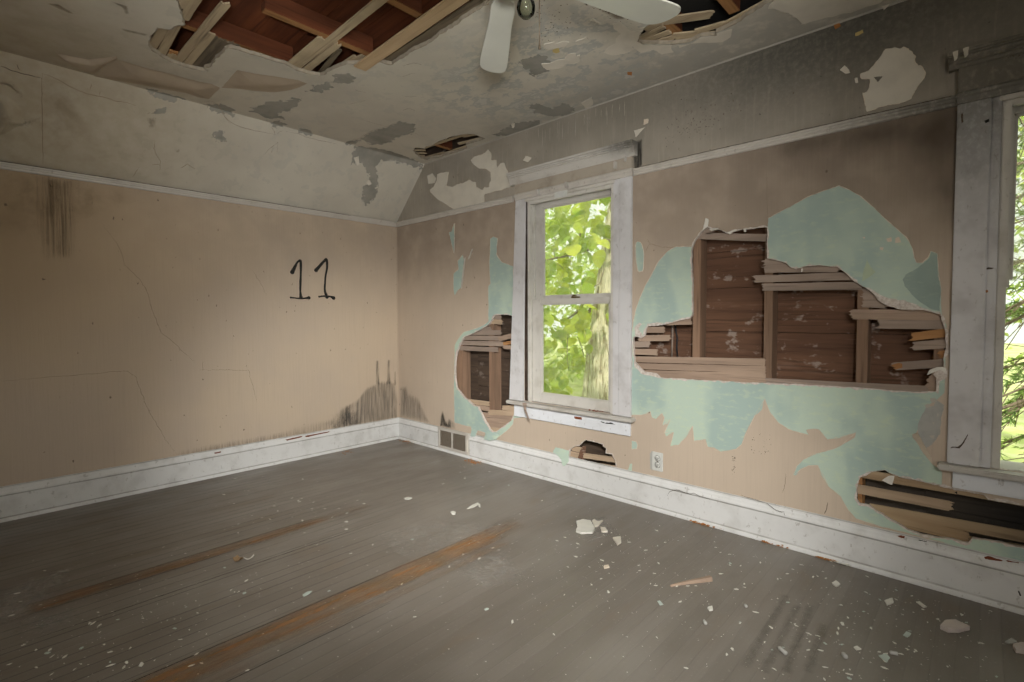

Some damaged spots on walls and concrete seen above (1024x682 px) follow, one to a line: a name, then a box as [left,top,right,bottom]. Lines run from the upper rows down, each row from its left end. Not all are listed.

peeling [840,47,926,112]
peeling [345,121,512,209]
flaking render [454,236,530,439]
peeling [632,185,1024,563]
flaking render [569,440,632,471]